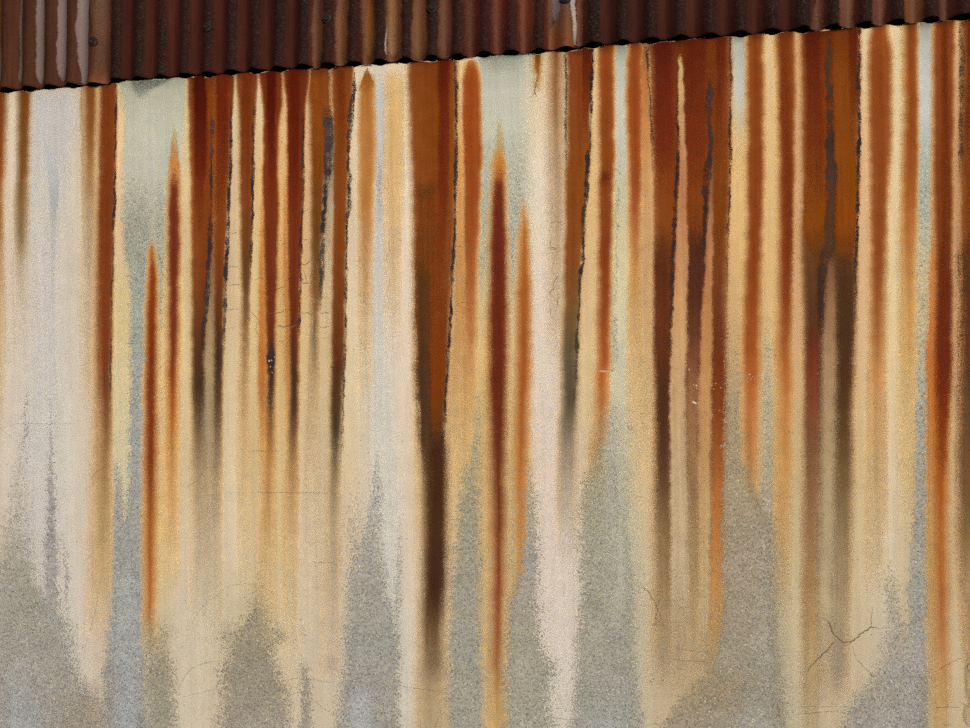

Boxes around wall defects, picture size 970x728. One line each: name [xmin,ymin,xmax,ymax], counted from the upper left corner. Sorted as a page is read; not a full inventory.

rust [78,0,119,643]
rust [138,0,736,728]
crack [808,609,879,674]
rust [737,0,970,728]